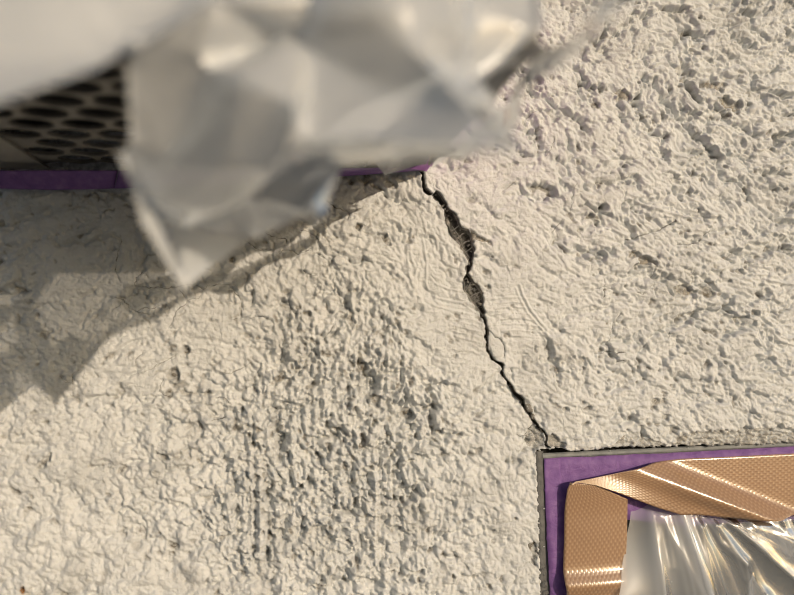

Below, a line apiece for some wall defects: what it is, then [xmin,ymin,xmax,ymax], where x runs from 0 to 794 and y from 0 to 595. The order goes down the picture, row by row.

crack [419,171,557,449]